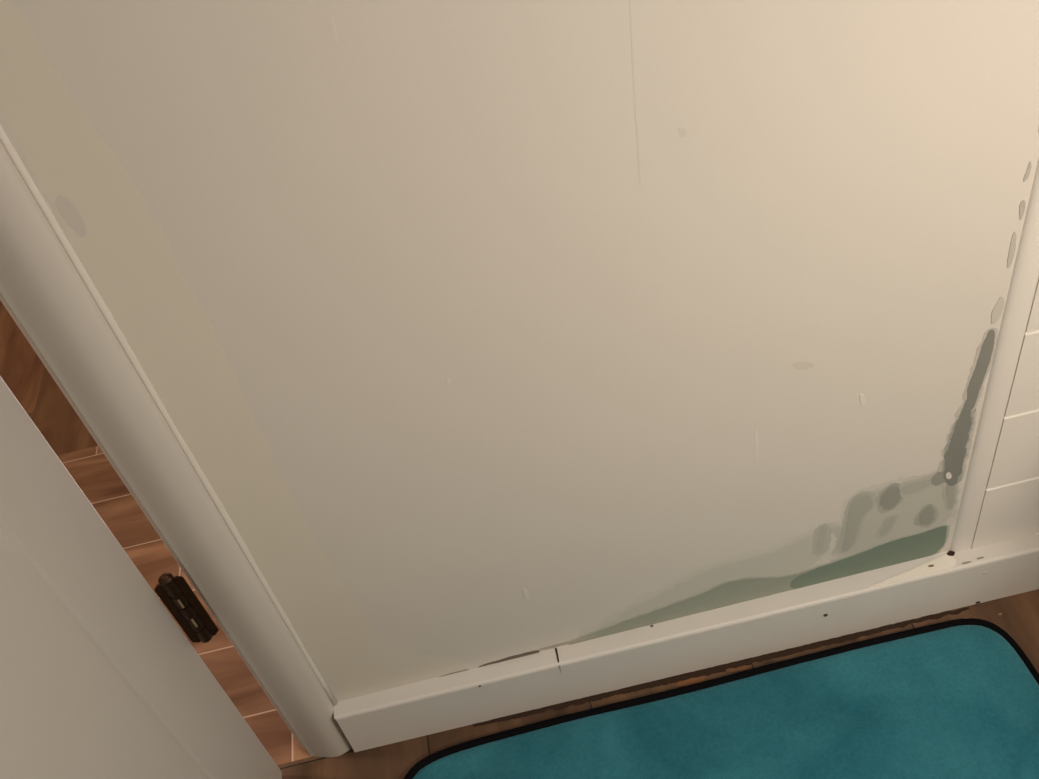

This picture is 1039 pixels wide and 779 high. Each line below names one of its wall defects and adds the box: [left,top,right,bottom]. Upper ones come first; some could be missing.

leakage [578,400,978,636]